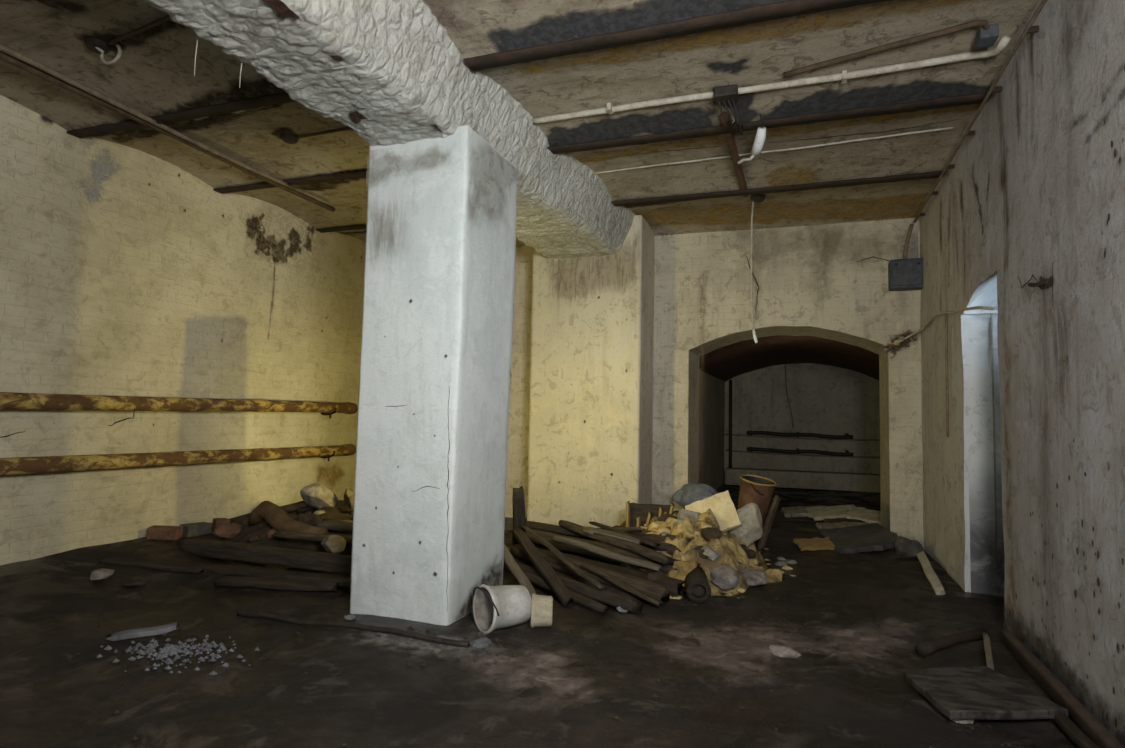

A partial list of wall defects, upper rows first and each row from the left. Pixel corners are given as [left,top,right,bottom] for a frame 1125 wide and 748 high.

water stain [489,0,787,52]
water stain [573,10,856,64]
water stain [708,59,748,73]
water stain [547,80,1001,161]